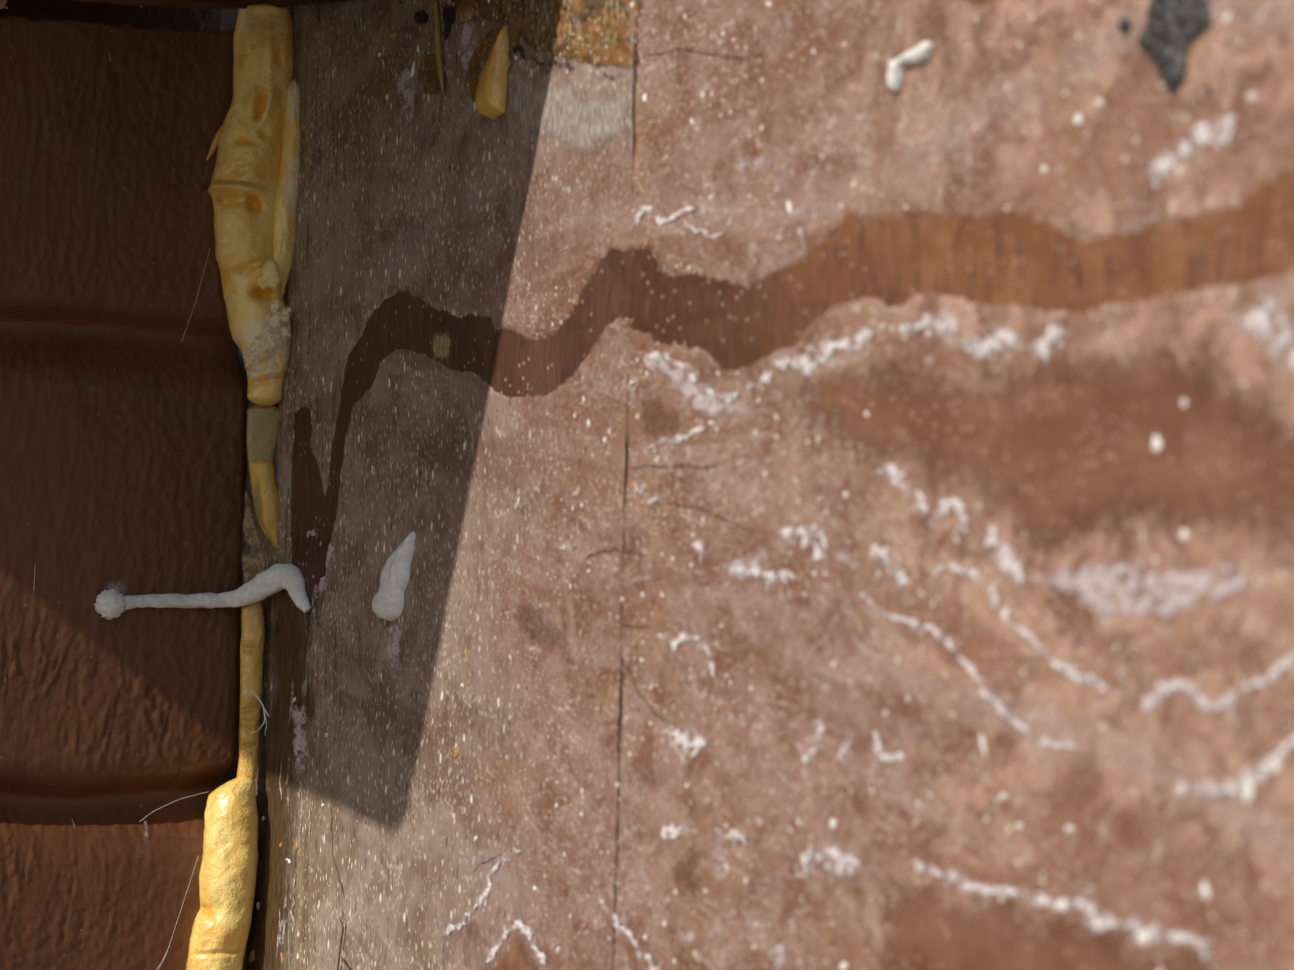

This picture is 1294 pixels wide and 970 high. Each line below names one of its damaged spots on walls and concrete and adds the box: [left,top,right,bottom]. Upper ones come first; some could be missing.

water stain [898,310,1067,364]
water stain [644,327,873,454]
peeling [290,173,1294,631]
water stain [877,464,969,536]
water stain [723,552,795,592]
water stain [781,522,910,589]
water stain [933,524,1246,692]
water stain [859,593,1029,734]
water stain [670,727,707,760]
water stain [801,843,859,879]
water stain [599,896,656,970]
water stain [912,859,1209,963]